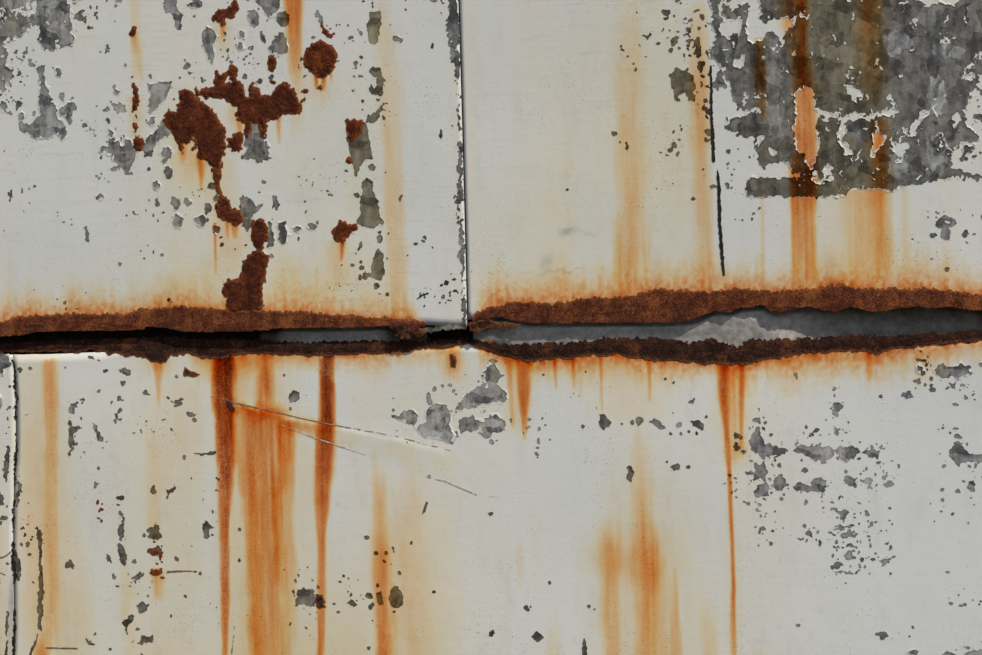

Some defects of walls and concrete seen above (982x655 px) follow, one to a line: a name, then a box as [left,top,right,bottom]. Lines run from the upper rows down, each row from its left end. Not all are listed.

corrosion [131,76,145,151]
peeling [0,0,290,235]
corrosion [162,64,309,226]
corrosion [267,54,277,72]
corrosion [301,23,339,91]
corrosion [345,118,363,142]
peeling [639,0,982,221]
peeling [391,358,512,445]
corrosion [0,218,982,600]
peeling [596,407,708,439]
peeling [723,387,900,588]
peeling [930,424,982,526]